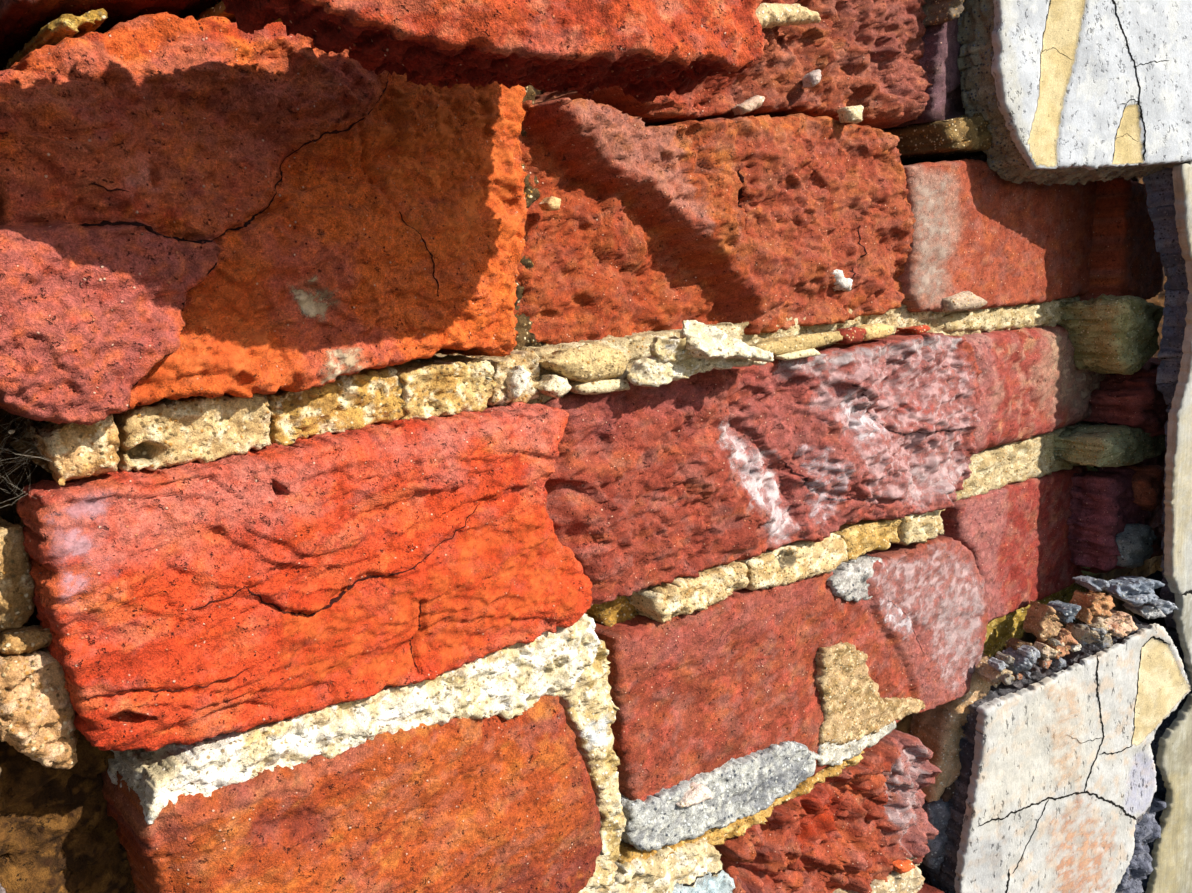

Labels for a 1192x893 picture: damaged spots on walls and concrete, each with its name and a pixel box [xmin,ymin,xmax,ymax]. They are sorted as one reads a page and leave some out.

crack [1039,0,1070,81]
crack [1112,0,1168,161]
water stain [773,336,980,505]
water stain [720,426,789,539]
water stain [809,463,851,519]
crack [193,504,479,617]
crack [84,669,247,700]
crack [409,600,422,672]
crack [978,570,1192,893]